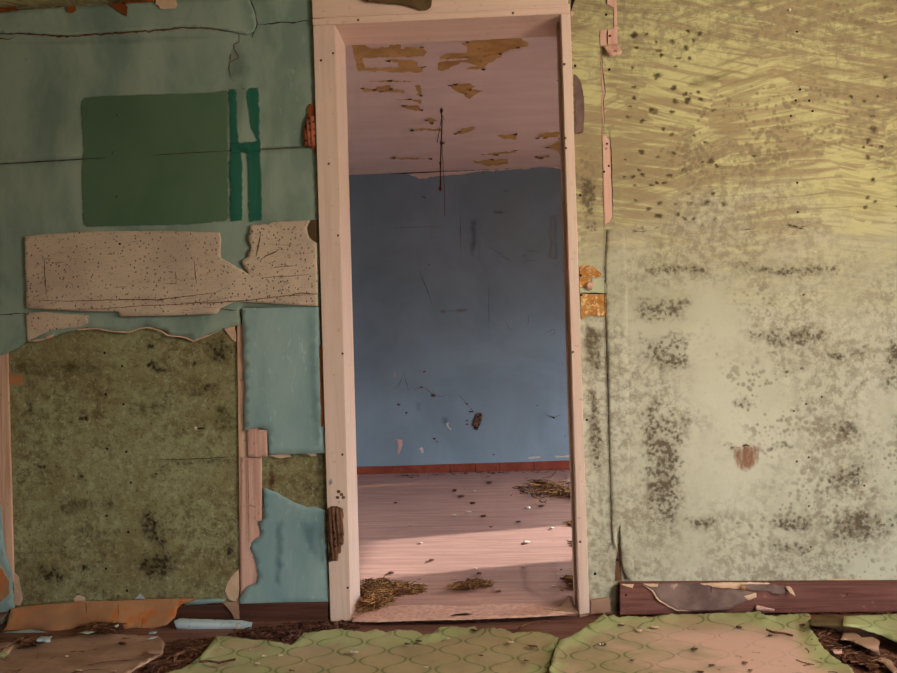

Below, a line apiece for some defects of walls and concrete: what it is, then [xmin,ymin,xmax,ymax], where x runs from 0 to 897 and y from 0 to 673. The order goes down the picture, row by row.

peeling [438,38,529,71]
peeling [352,44,441,132]
peeling [448,83,484,99]
peeling [472,133,518,166]
peeling [535,131,560,159]
peeling [580,265,607,319]
mould [586,327,600,369]
damp [648,339,687,368]
damp [752,326,823,346]
mould [590,393,603,467]
mould [642,403,682,522]
mould [833,514,897,541]